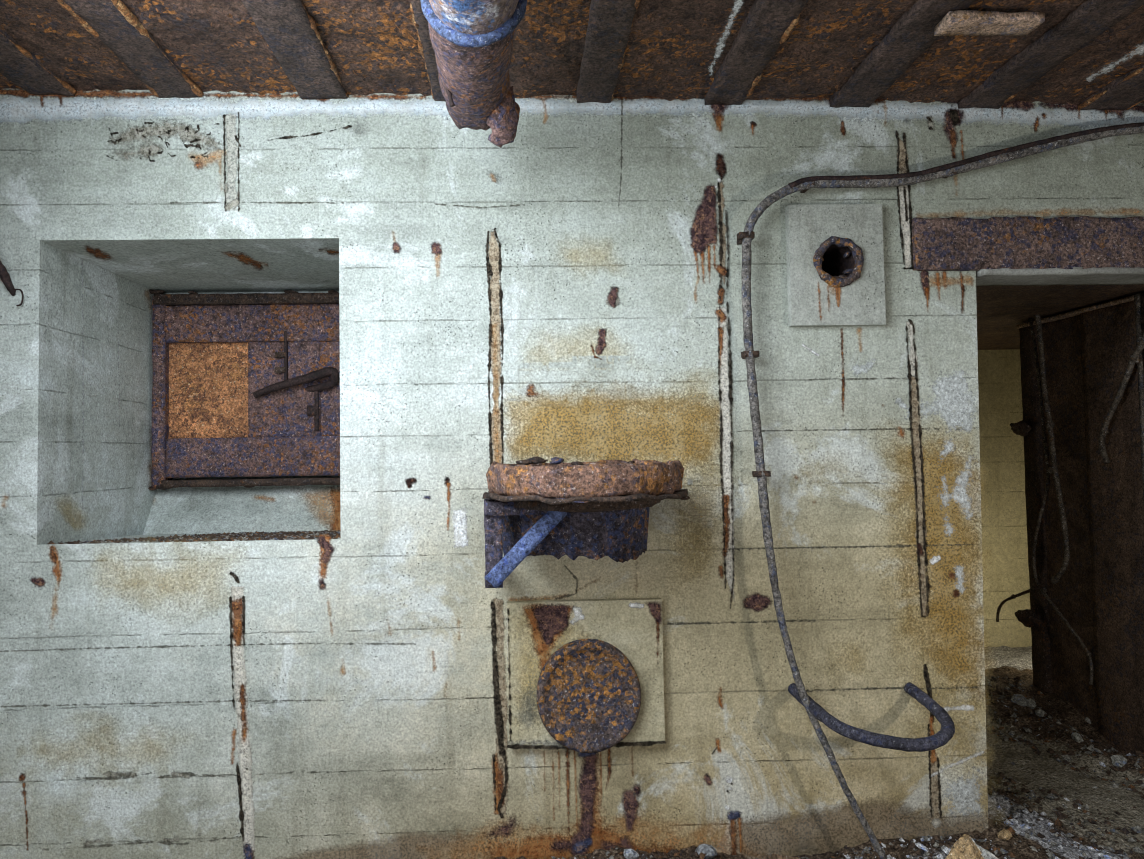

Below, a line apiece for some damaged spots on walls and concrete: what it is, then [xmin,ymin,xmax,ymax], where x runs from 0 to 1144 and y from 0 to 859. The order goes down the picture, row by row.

corrosion [57,0,99,37]
corrosion [0,32,159,106]
corrosion [111,0,304,100]
corrosion [301,2,455,107]
spalling [107,120,220,162]
corrosion [690,153,726,300]
corrosion [818,252,853,319]
leakage [896,370,983,690]
corrosion [544,748,611,856]
corrosion [620,752,640,849]